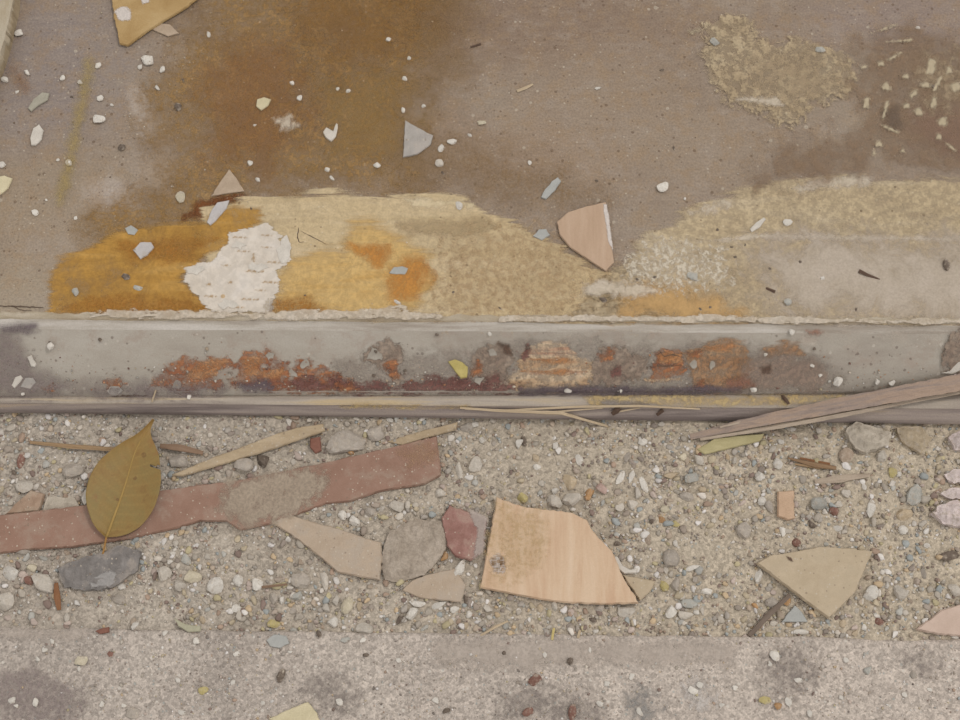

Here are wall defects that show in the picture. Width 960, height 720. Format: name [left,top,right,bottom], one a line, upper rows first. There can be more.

peeling [696,13,858,131]
peeling [183,170,960,375]